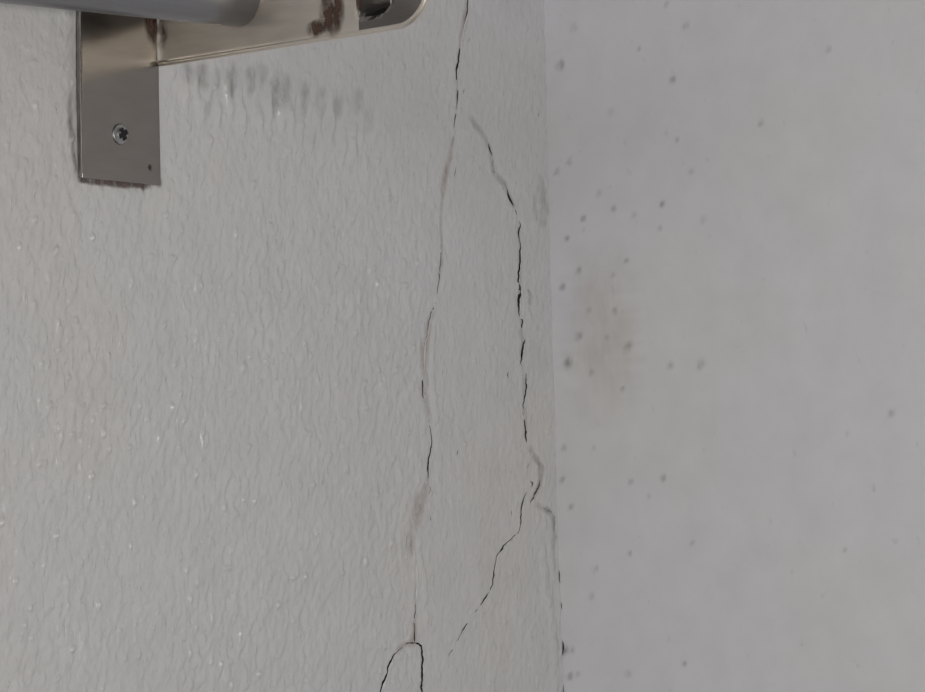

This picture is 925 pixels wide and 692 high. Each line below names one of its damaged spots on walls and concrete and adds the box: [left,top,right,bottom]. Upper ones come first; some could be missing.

crack [453,0,470,140]
crack [426,425,434,493]
crack [422,253,441,403]
crack [449,144,555,655]
crack [380,543,426,692]